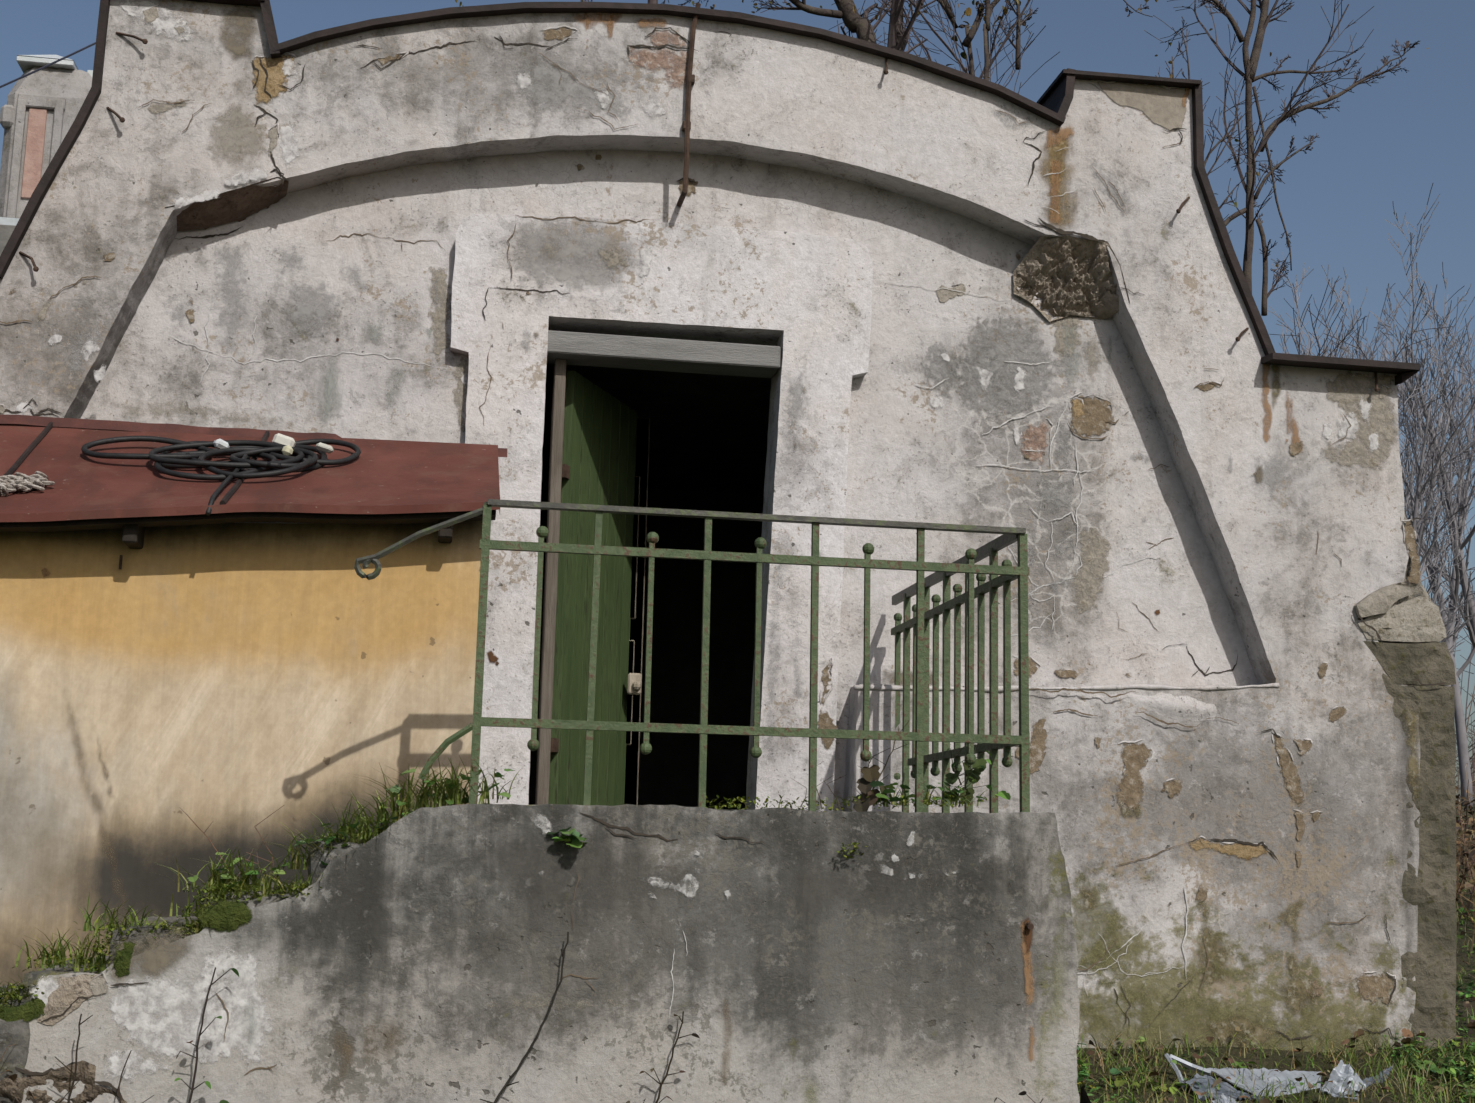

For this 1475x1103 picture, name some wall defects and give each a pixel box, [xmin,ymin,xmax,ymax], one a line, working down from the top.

spalling [252,52,305,103]
peeling [515,53,666,130]
spalling [627,27,699,88]
spalling [165,168,289,239]
spalling [887,218,1144,613]
corrosion [1263,364,1303,456]
peeling [1095,737,1155,816]
peeling [1116,728,1322,869]
peeling [0,936,272,1103]